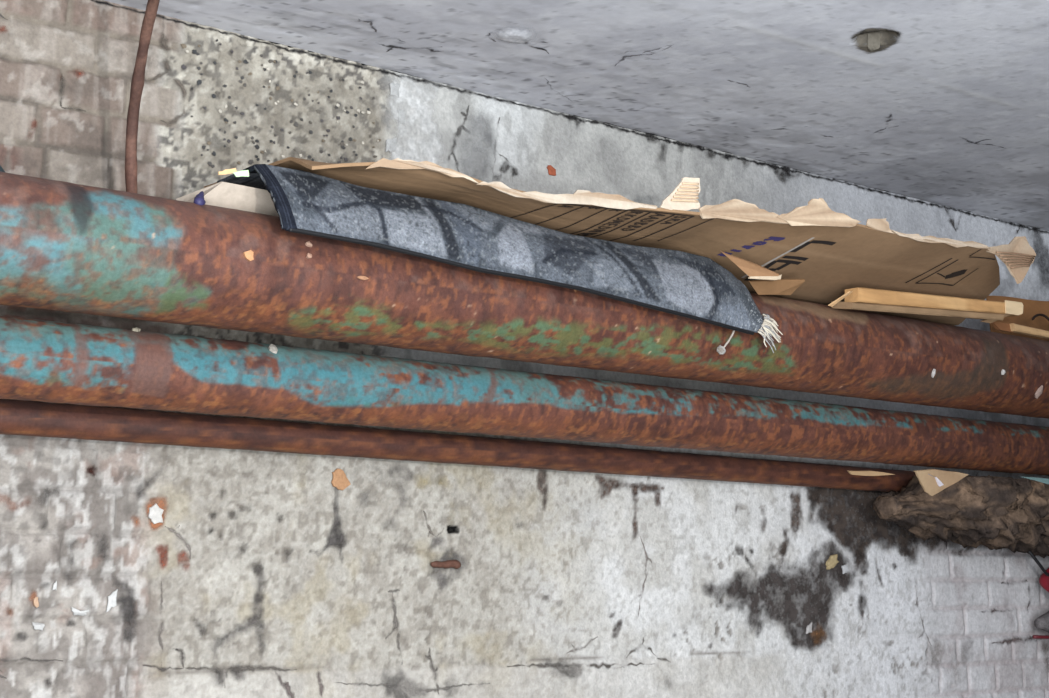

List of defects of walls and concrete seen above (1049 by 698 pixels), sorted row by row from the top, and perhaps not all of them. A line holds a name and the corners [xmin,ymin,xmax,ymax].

crack [91,0,1049,233]
spalling [853,28,900,53]
damp [705,487,986,648]